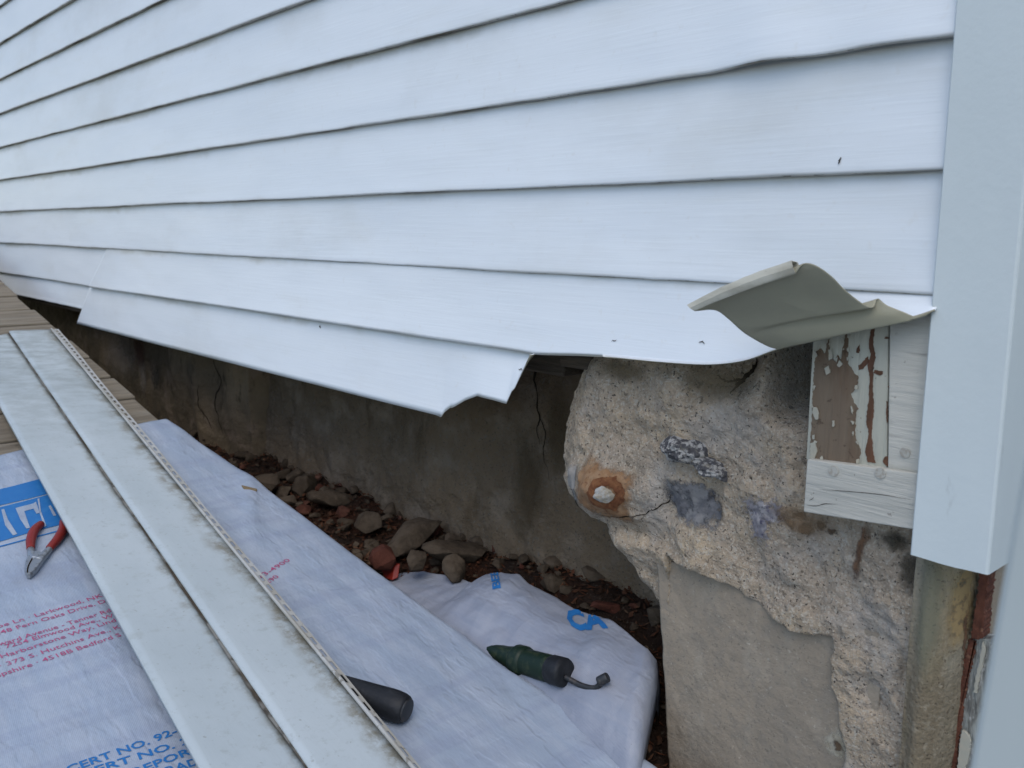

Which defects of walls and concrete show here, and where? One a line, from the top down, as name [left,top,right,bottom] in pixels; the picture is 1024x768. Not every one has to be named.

crack [533,372,549,476]
peeling [810,329,889,466]
corrosion [576,458,633,522]
crack [601,495,671,518]
corrosion [950,570,997,768]